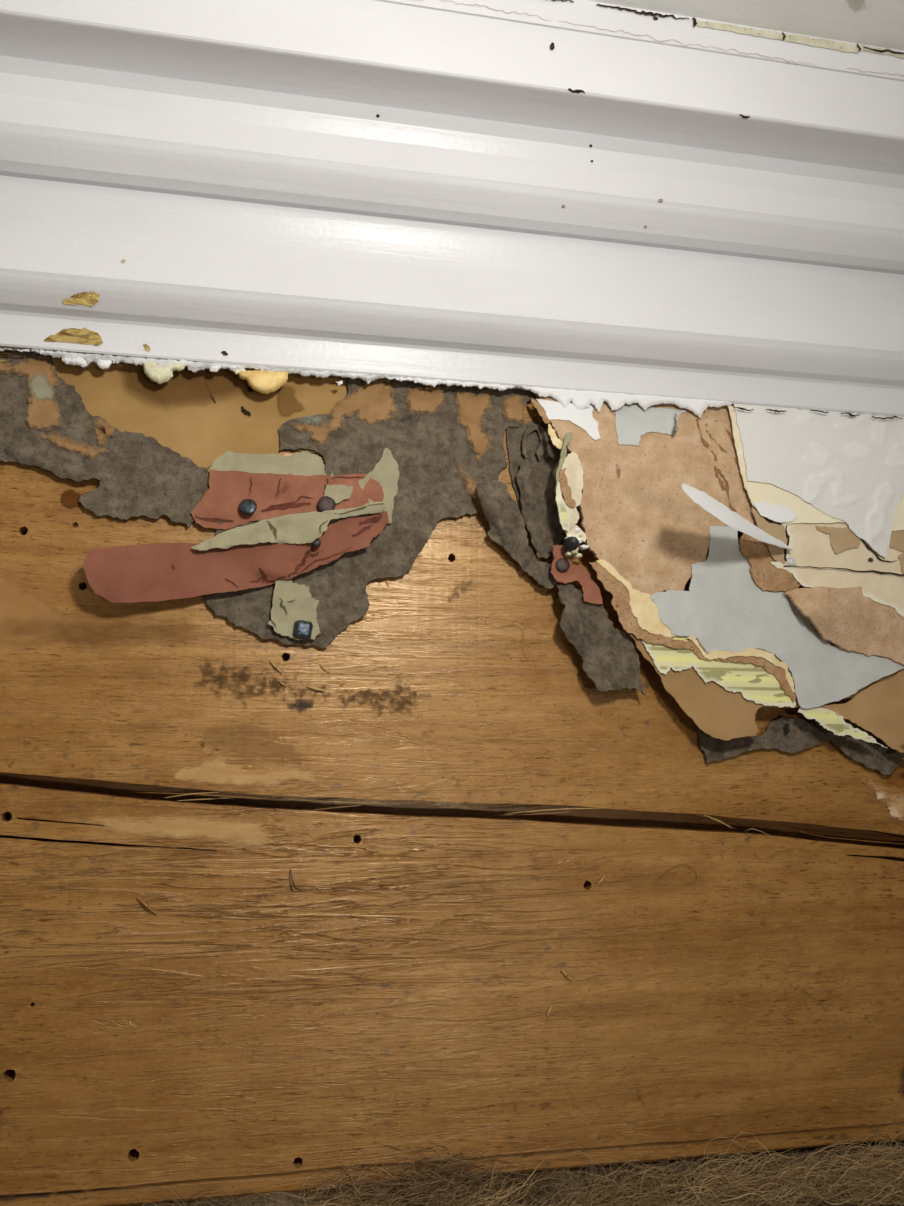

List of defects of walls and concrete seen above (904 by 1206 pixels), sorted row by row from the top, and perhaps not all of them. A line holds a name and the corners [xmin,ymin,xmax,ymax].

crack [442,0,814,65]
peeling [0,328,734,497]
crack [0,772,904,862]